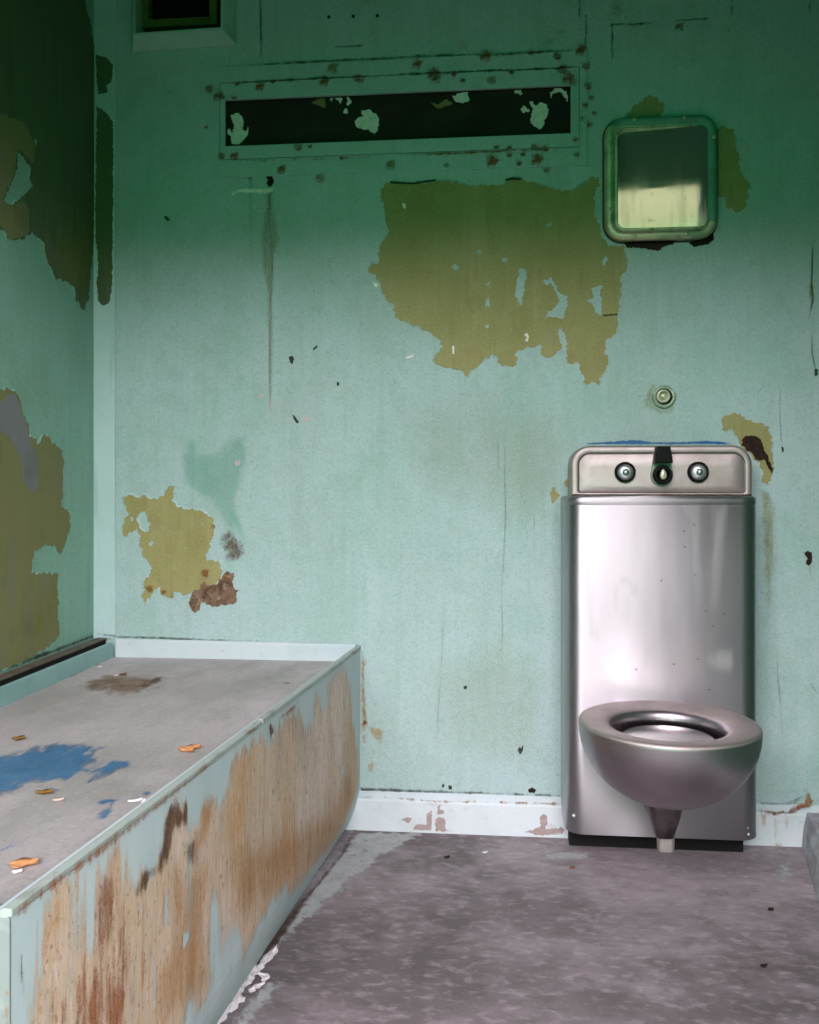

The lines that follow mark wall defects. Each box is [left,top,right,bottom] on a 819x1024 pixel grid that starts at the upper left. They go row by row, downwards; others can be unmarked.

corrosion [552,43,596,127]
peeling [0,0,115,312]
corrosion [218,136,581,184]
peeling [367,175,629,388]
peeling [720,412,774,486]
peeling [0,385,71,673]
peeling [121,486,239,613]
damp [81,675,171,697]
corrosion [18,657,387,1024]
peeling [401,805,447,832]
peeling [526,814,564,836]
corrosion [760,780,813,846]